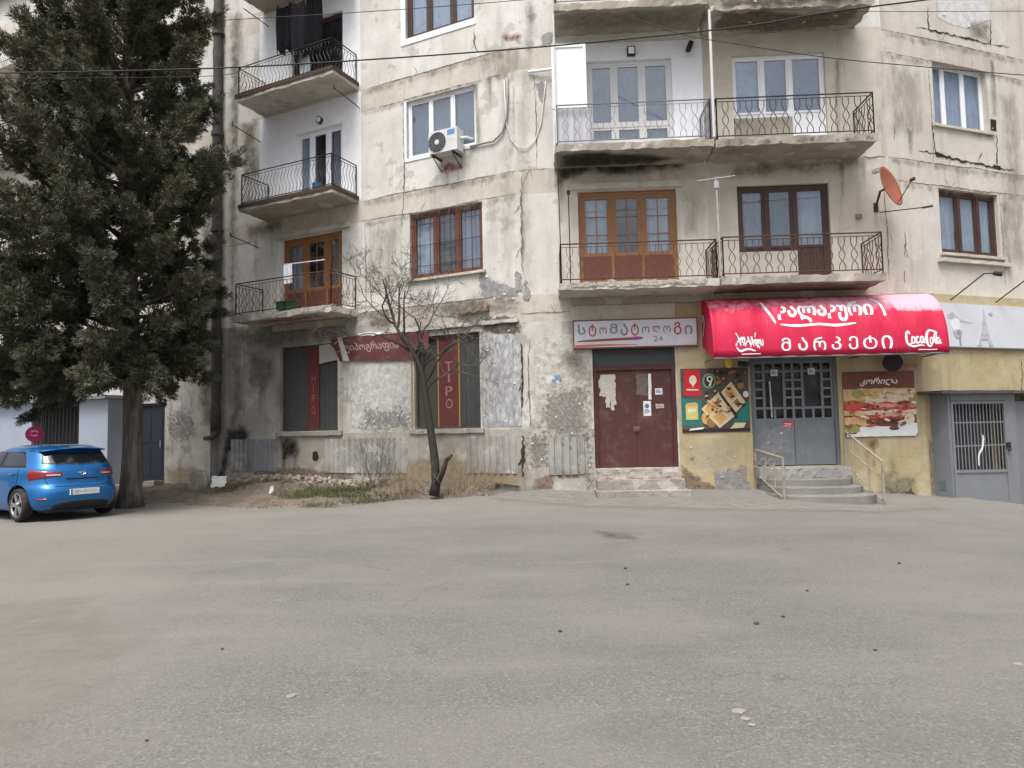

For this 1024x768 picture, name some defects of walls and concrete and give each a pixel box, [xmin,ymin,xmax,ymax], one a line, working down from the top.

crack [361,34,588,477]
peeling [479,271,530,301]
peeling [481,316,595,489]
crack [862,12,1024,284]